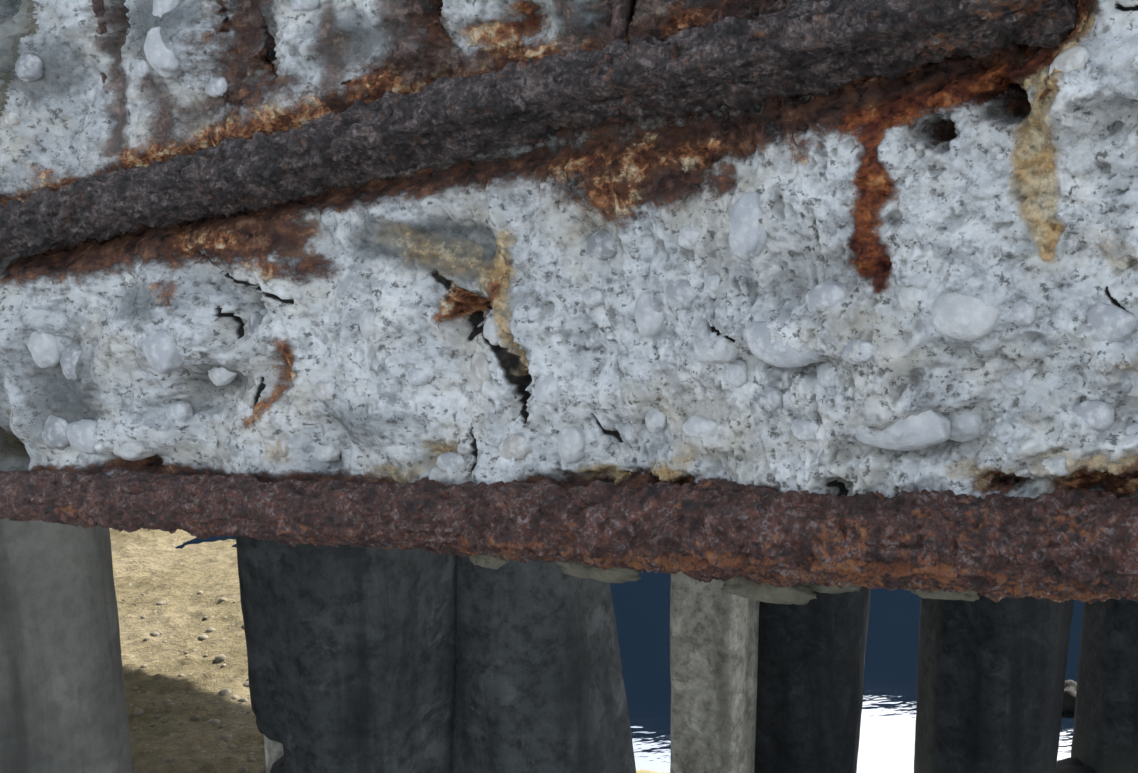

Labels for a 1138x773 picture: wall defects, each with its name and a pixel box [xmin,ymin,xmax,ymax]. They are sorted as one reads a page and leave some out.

crack [1116,4,1138,12]
rust [0,0,1099,302]
spalling [0,0,1138,500]
rust [432,232,529,370]
crack [432,270,532,424]
rust [31,455,421,486]
rust [425,442,457,455]
crack [470,427,478,472]
rust [520,450,702,490]
rust [963,460,1027,495]
rust [1051,454,1138,499]